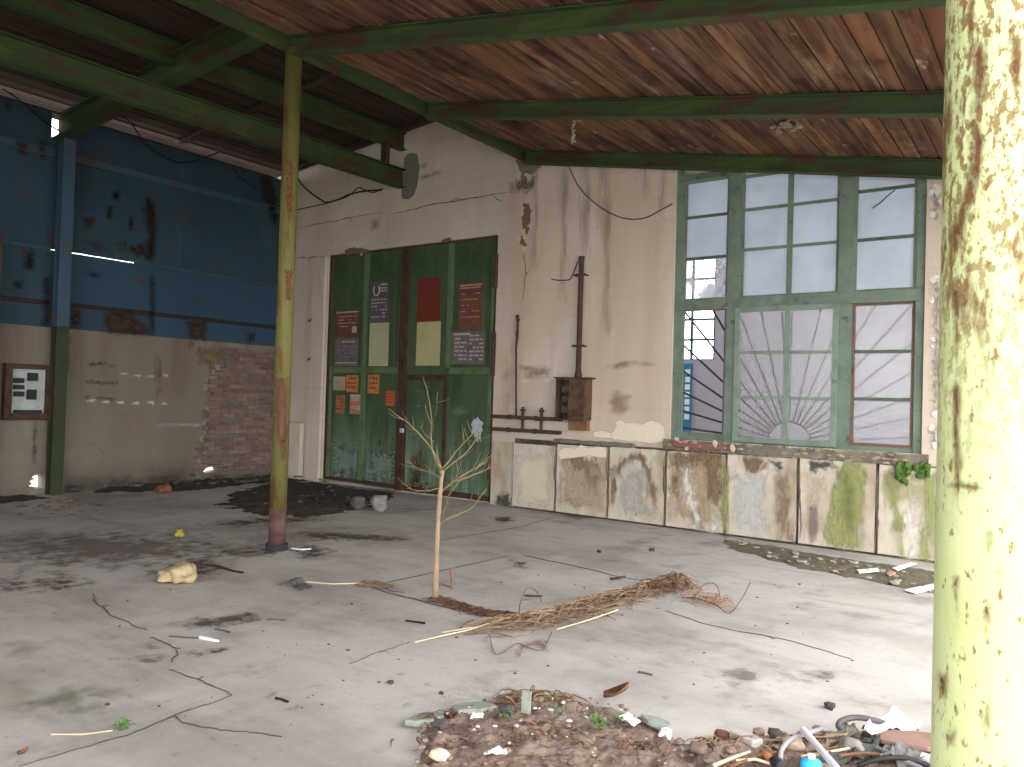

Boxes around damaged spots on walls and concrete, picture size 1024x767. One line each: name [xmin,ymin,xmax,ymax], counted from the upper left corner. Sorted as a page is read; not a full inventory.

rust [974,51,987,105]
rust [1010,30,1021,95]
rust [118,199,156,260]
crack [300,192,506,228]
peeling [518,203,531,253]
rust [954,129,983,249]
spalling [89,348,275,504]
rust [953,385,978,490]
water stain [560,452,656,518]
water stain [669,449,792,540]
water stain [889,475,926,558]